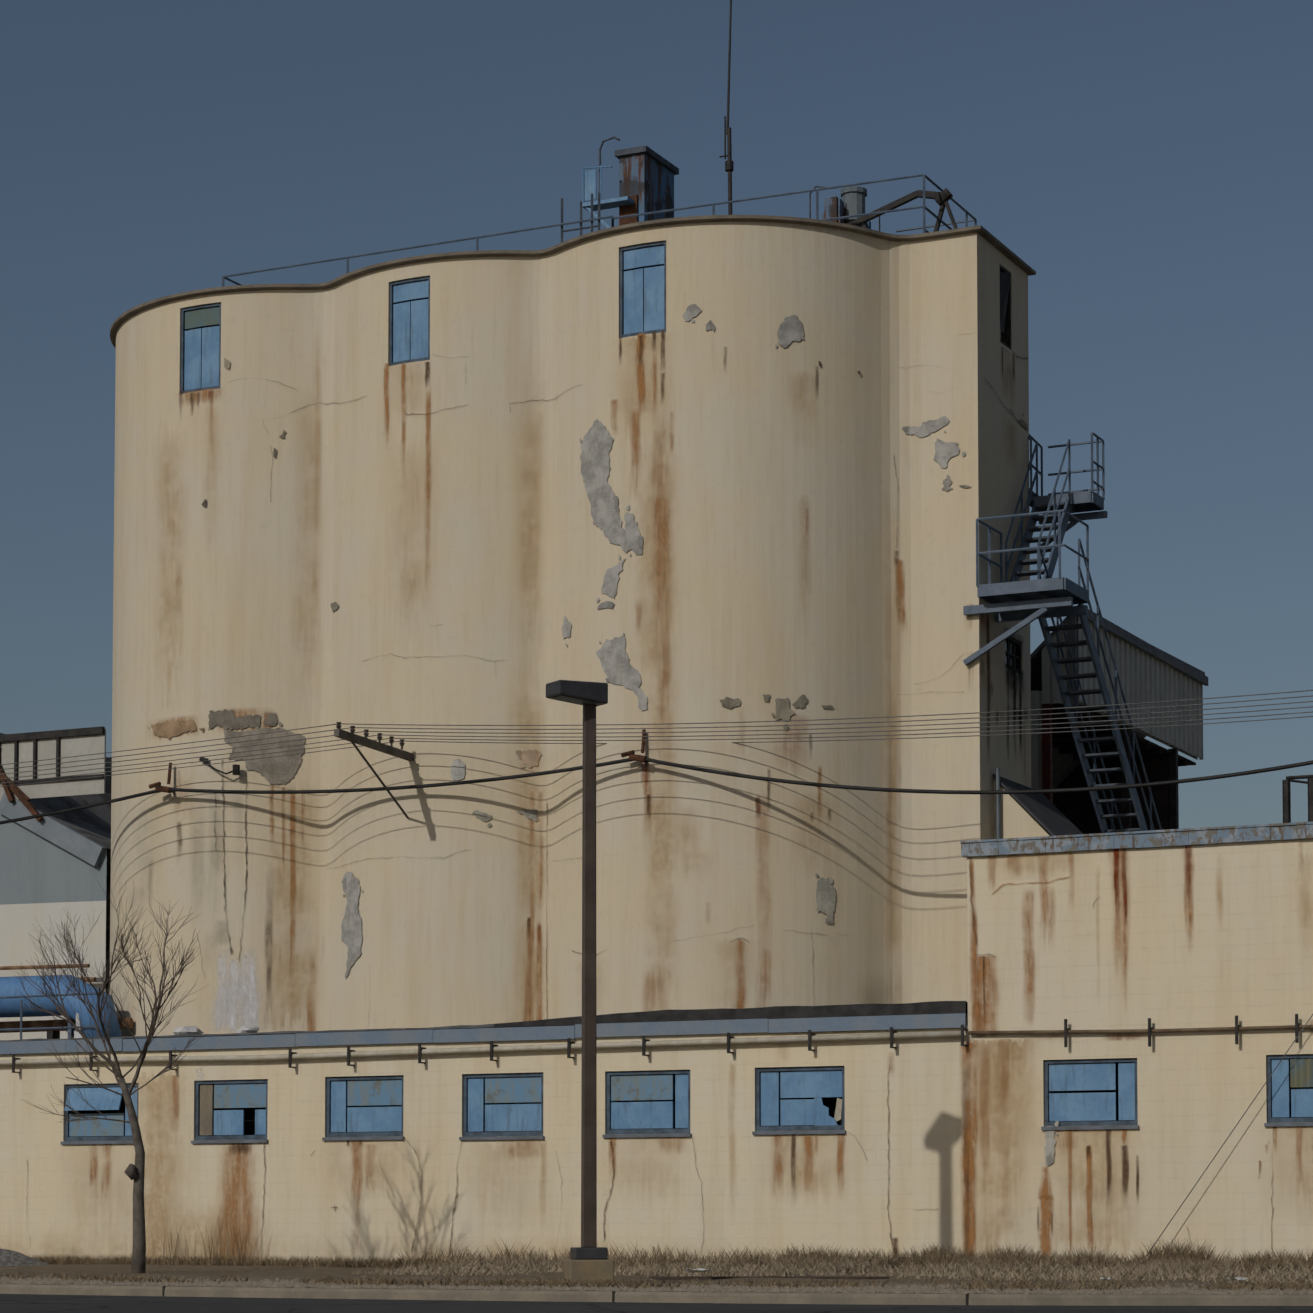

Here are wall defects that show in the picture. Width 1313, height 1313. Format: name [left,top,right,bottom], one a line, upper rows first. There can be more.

spalling [775,315,804,348]
rust [633,330,665,463]
spalling [902,416,970,491]
spalling [579,419,643,609]
spalling [596,633,648,711]
spalling [151,709,305,785]
spalling [341,872,363,978]
rust [1114,849,1127,917]
rust [962,913,995,1063]
rust [963,1098,977,1259]
rust [1040,1168,1052,1257]
rust [1069,1129,1139,1244]